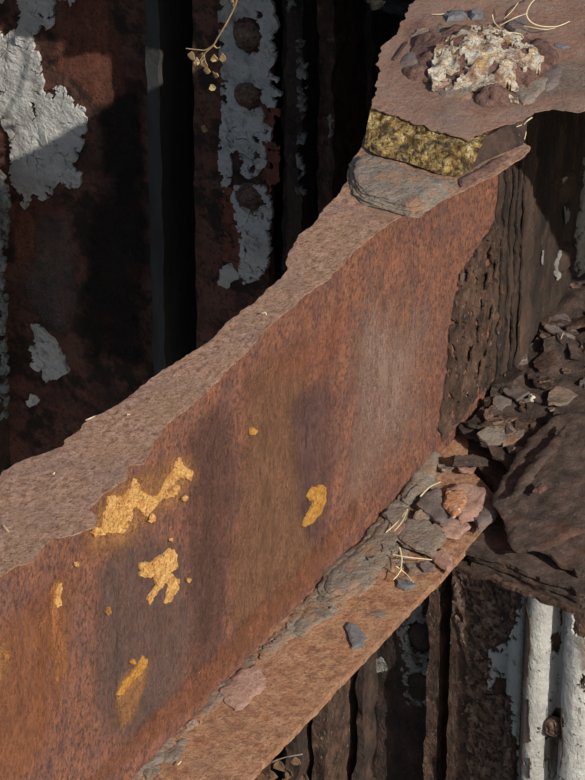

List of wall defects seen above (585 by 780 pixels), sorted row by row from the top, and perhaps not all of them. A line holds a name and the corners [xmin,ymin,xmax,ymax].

peeling [0,0,88,421]
peeling [217,0,283,289]
peeling [295,38,309,196]
peeling [553,250,562,280]
peeling [564,157,585,277]
rust [293,380,332,542]
rust [87,457,190,736]
rust [219,664,266,711]
rust [345,622,366,649]
peeling [376,657,388,673]
peeling [396,603,429,707]
peeling [452,572,585,780]